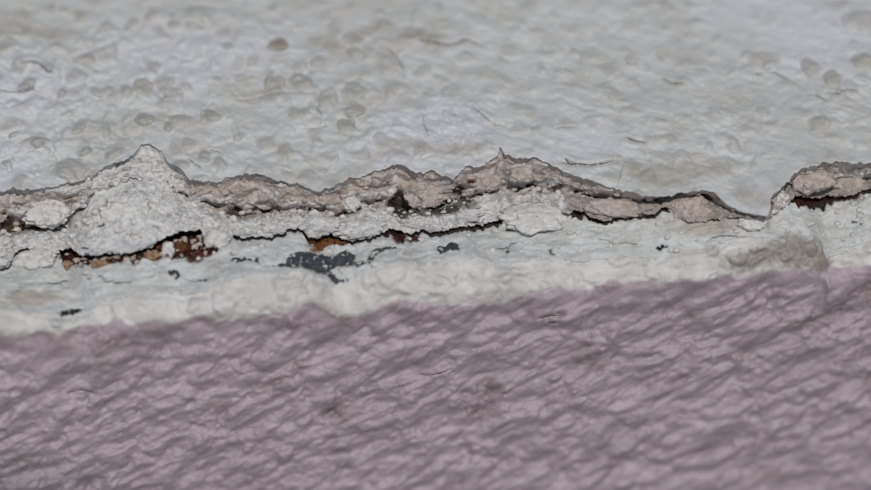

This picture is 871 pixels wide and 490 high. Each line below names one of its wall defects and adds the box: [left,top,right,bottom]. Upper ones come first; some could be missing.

crack [572,210,669,225]
crack [0,249,28,271]
corrosion [61,239,211,271]
crack [233,224,304,242]
corrosion [311,238,346,257]
corrosion [392,232,419,244]
crack [346,220,503,245]
spalling [0,144,871,319]